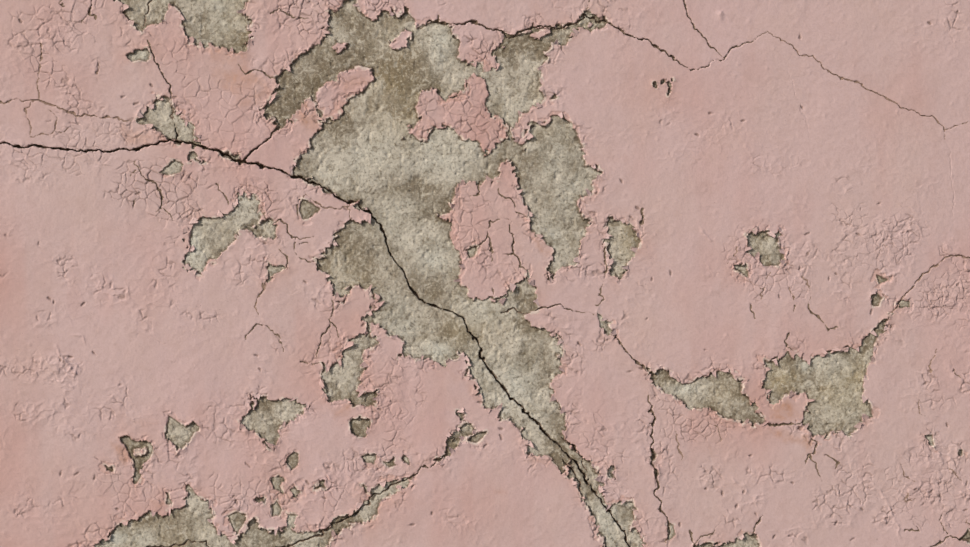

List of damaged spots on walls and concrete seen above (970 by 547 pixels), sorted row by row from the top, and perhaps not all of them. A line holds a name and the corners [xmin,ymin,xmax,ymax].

peeling [112,0,257,64]
crack [417,0,968,139]
peeling [135,94,208,177]
peeling [181,189,280,277]
crack [0,0,741,547]
peeling [257,0,648,547]
crack [718,223,838,350]
peeling [645,272,911,439]
crack [888,252,970,378]
peeling [90,392,415,547]
crack [760,412,840,476]
crack [859,460,970,547]